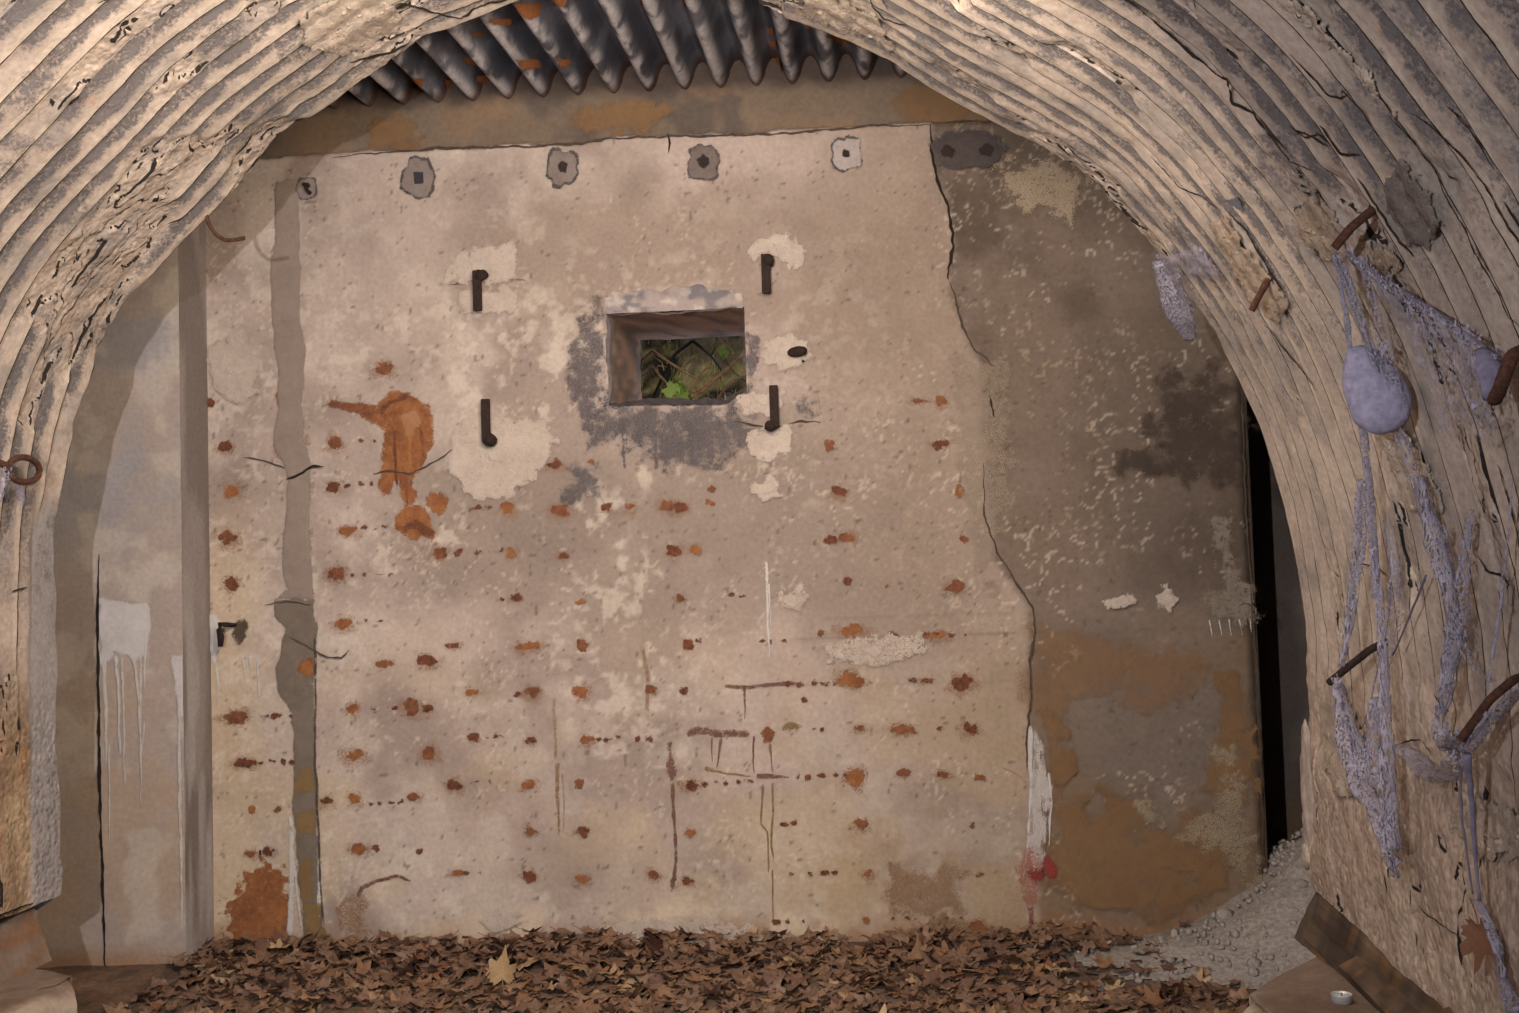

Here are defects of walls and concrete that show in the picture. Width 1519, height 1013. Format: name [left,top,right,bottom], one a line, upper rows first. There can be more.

spalling [793,0,895,52]
crack [870,0,904,26]
crack [1124,0,1519,327]
crack [929,127,995,417]
rust [300,358,522,566]
rust [596,484,716,518]
flaking render [605,307,814,502]
water stain [99,597,152,840]
water stain [170,654,183,928]
water stain [210,613,224,704]
water stain [877,350,1267,939]
rust [218,846,303,947]